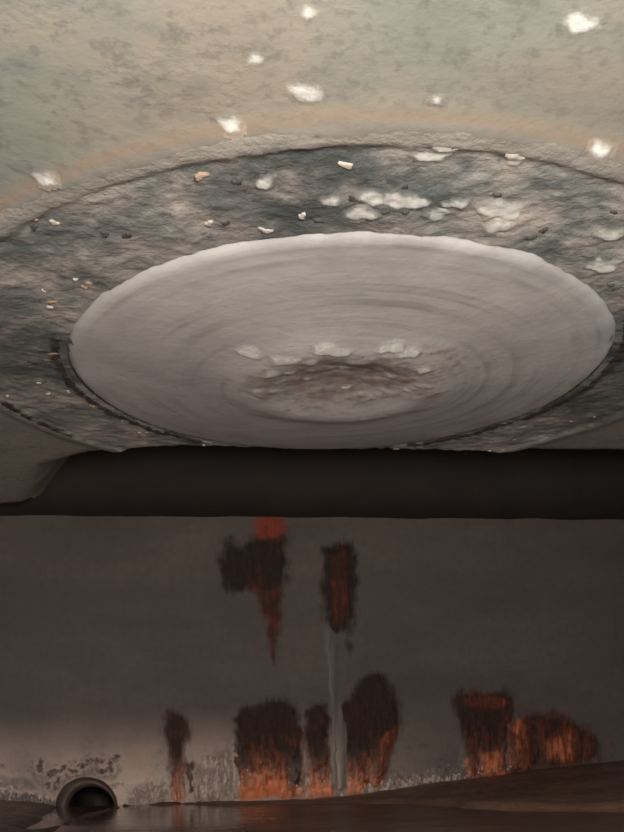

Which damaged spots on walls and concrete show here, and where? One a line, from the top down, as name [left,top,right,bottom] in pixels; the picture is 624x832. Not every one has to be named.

damp [248,173,277,191]
damp [315,187,529,234]
damp [409,147,461,164]
spalling [0,131,624,453]
crack [0,391,83,439]
crack [39,335,211,444]
corrosion [208,517,298,671]
damp [0,769,57,806]
corrosion [112,700,199,803]
corrosion [222,689,335,801]
corrosion [341,663,411,796]
corrosion [441,681,605,778]